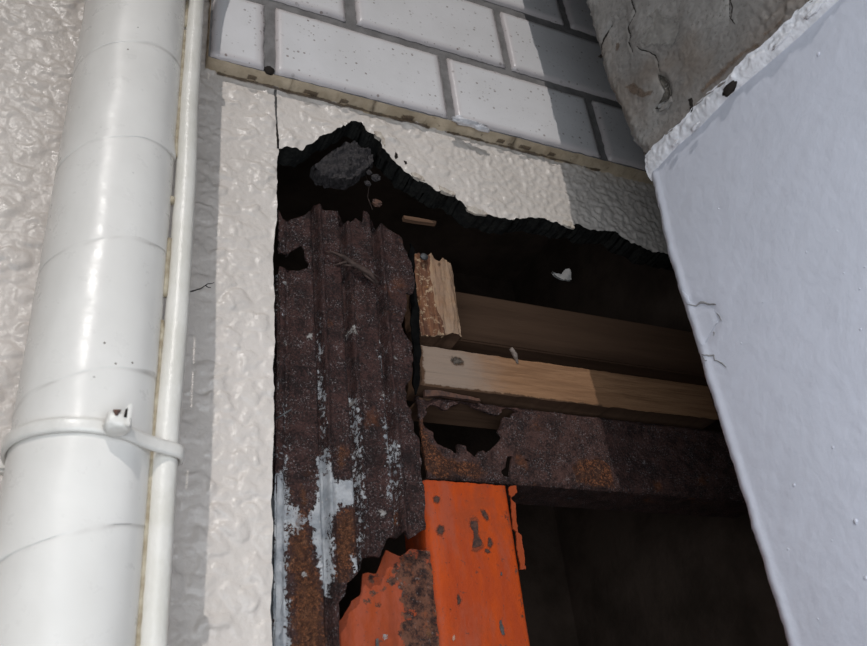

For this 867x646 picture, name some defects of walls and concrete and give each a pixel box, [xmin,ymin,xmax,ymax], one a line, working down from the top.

crack [628,0,660,71]
spalling [277,121,674,272]
peeling [414,253,445,338]
peeling [682,291,718,345]
crack [687,301,726,367]
corrosion [469,509,493,553]
peeling [508,486,526,570]